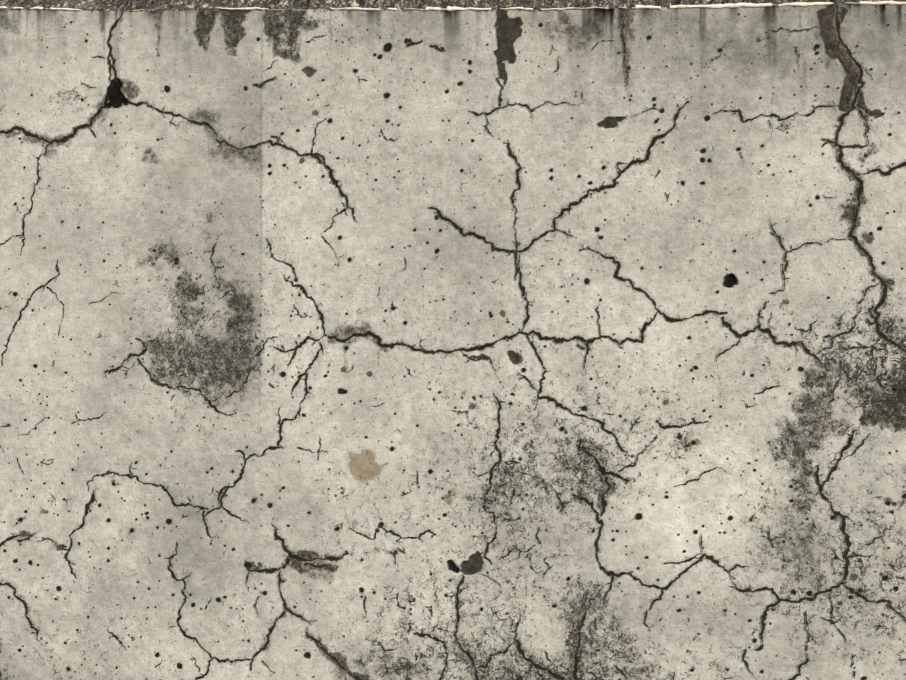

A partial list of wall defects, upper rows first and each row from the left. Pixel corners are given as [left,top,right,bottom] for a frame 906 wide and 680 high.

damp [194,10,252,56]
damp [263,9,327,63]
damp [494,10,610,85]
damp [810,5,885,121]
crack [0,0,358,266]
crack [1,259,64,366]
mould [138,239,260,406]
crack [38,490,97,578]
crack [148,523,364,680]
crack [334,523,437,564]
crack [468,393,553,586]
damp [749,348,906,581]